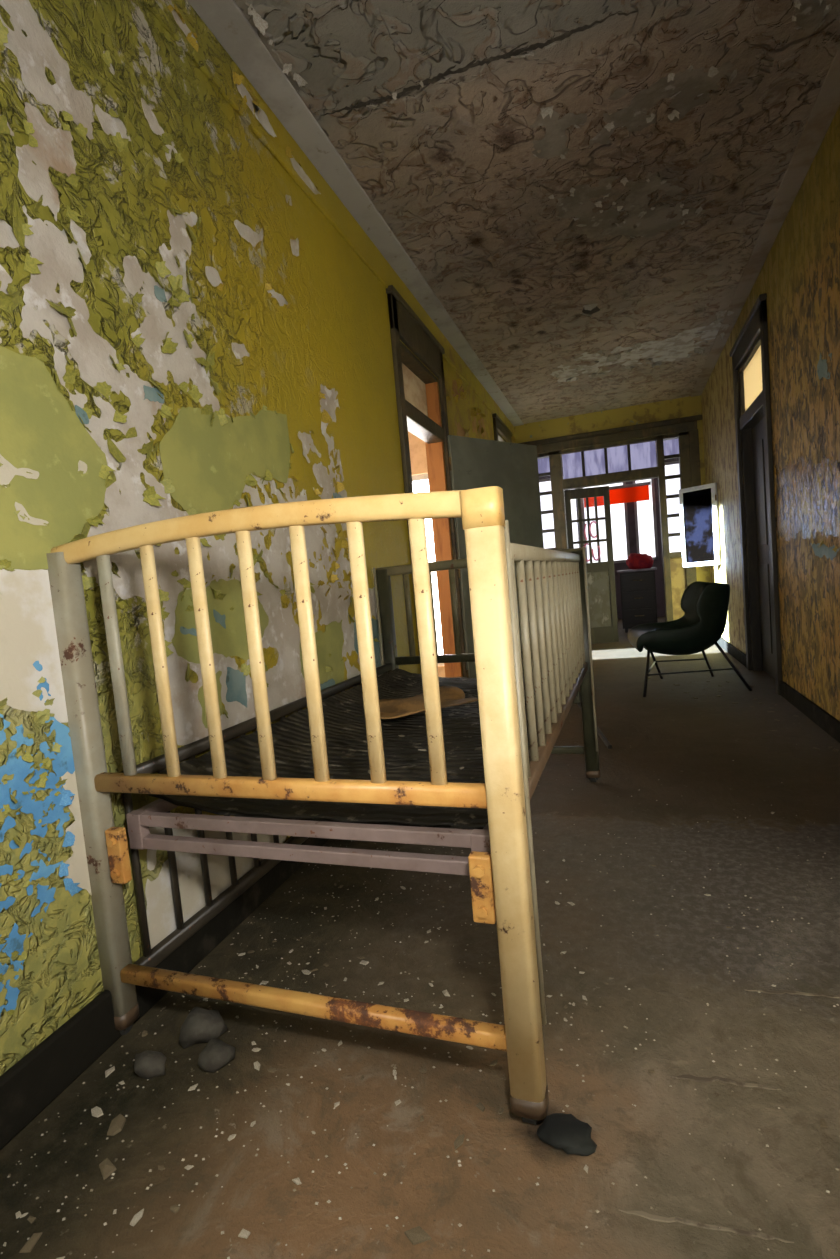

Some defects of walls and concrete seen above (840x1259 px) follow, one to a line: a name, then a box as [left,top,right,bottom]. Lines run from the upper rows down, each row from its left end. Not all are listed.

crack [321,11,638,116]
peeling [0,0,362,1016]
peeling [368,587,385,677]